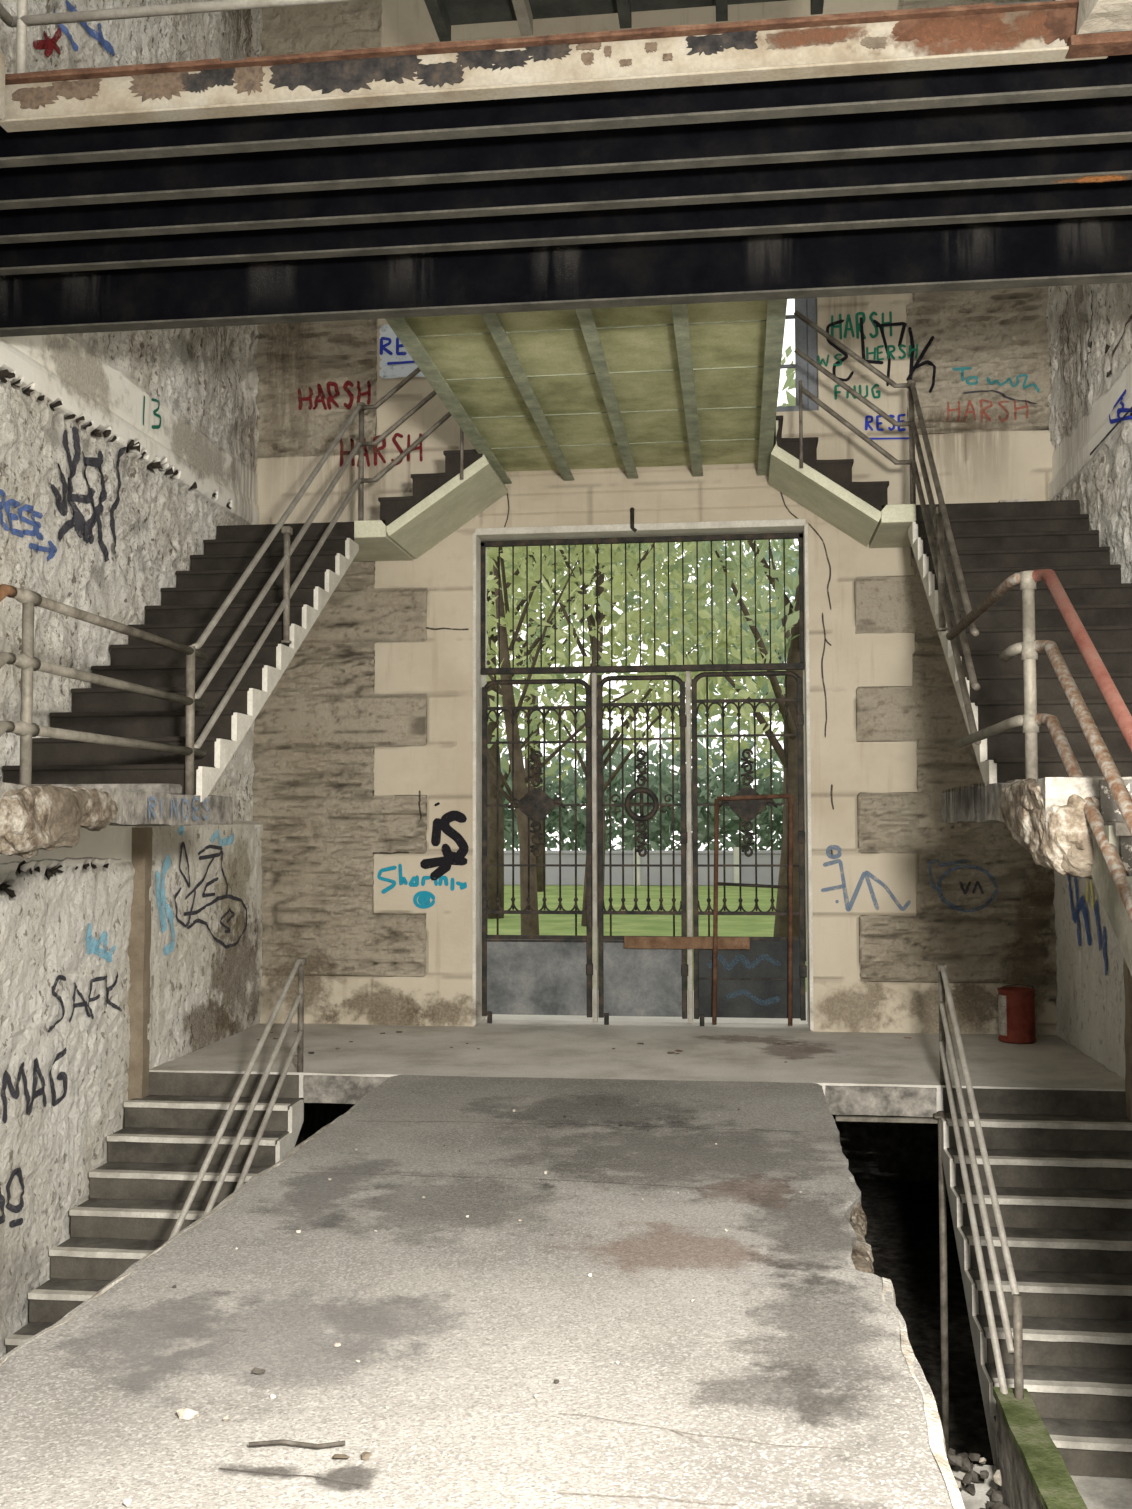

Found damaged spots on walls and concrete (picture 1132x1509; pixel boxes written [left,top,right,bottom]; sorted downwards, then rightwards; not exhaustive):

peeling [12,78,102,109]
peeling [128,7,1078,102]
corrosion [770,26,863,48]
corrosion [892,8,1063,55]
spalling [0,784,118,898]
spalling [848,1202,965,1509]